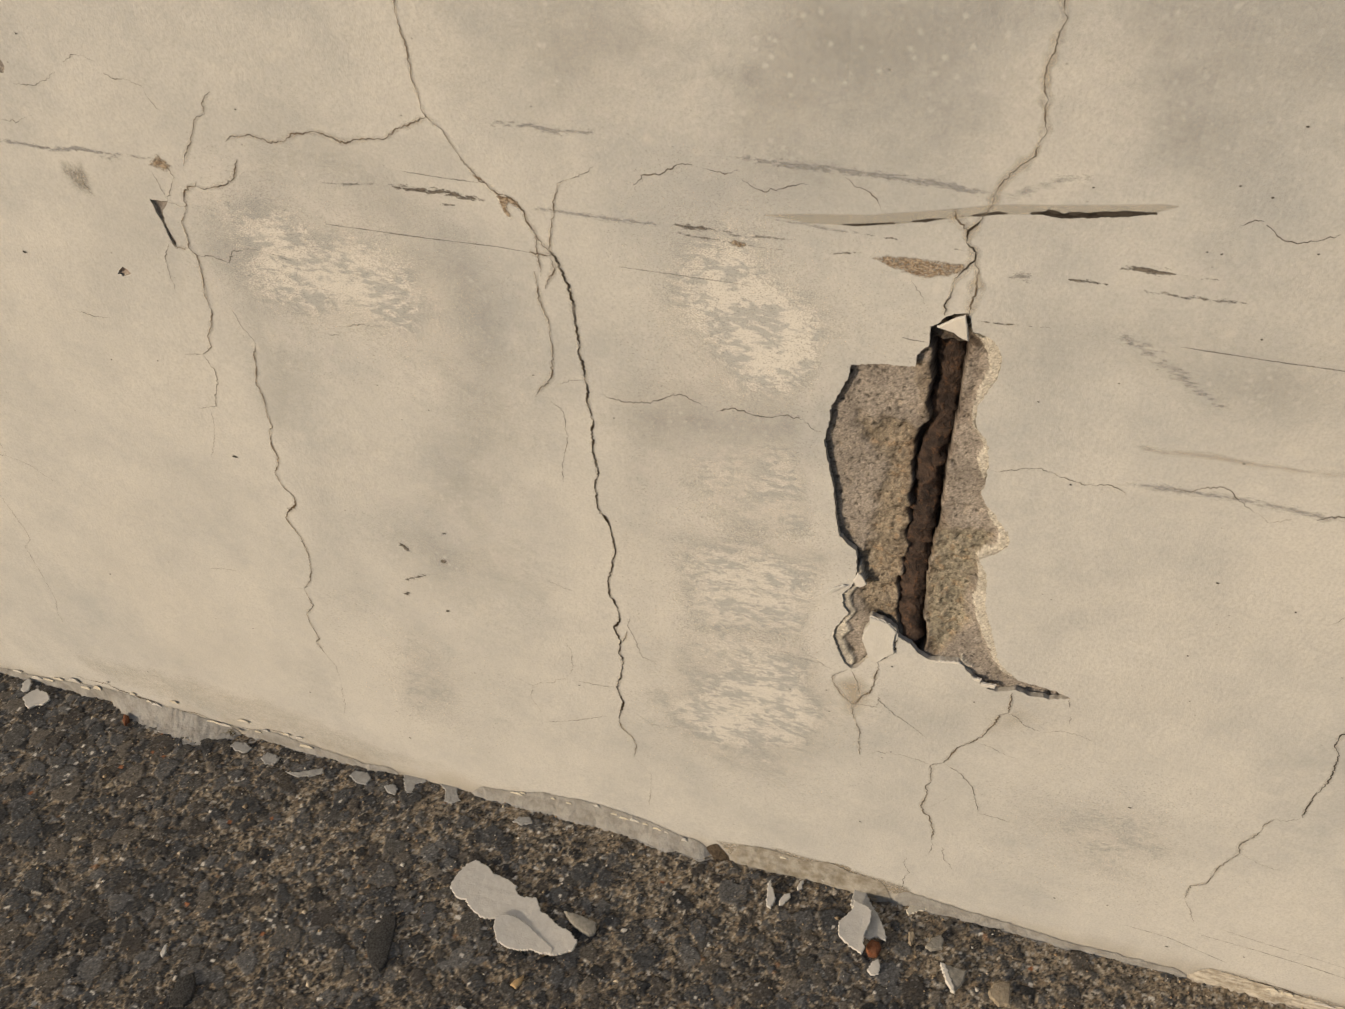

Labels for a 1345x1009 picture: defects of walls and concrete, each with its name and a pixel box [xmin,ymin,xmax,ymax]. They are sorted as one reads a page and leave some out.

crack [944,1,1068,316]
crack [165,1,799,752]
spalling [824,313,1070,700]
crack [831,640,1033,883]
crack [1188,821,1271,920]
crack [1303,734,1345,815]